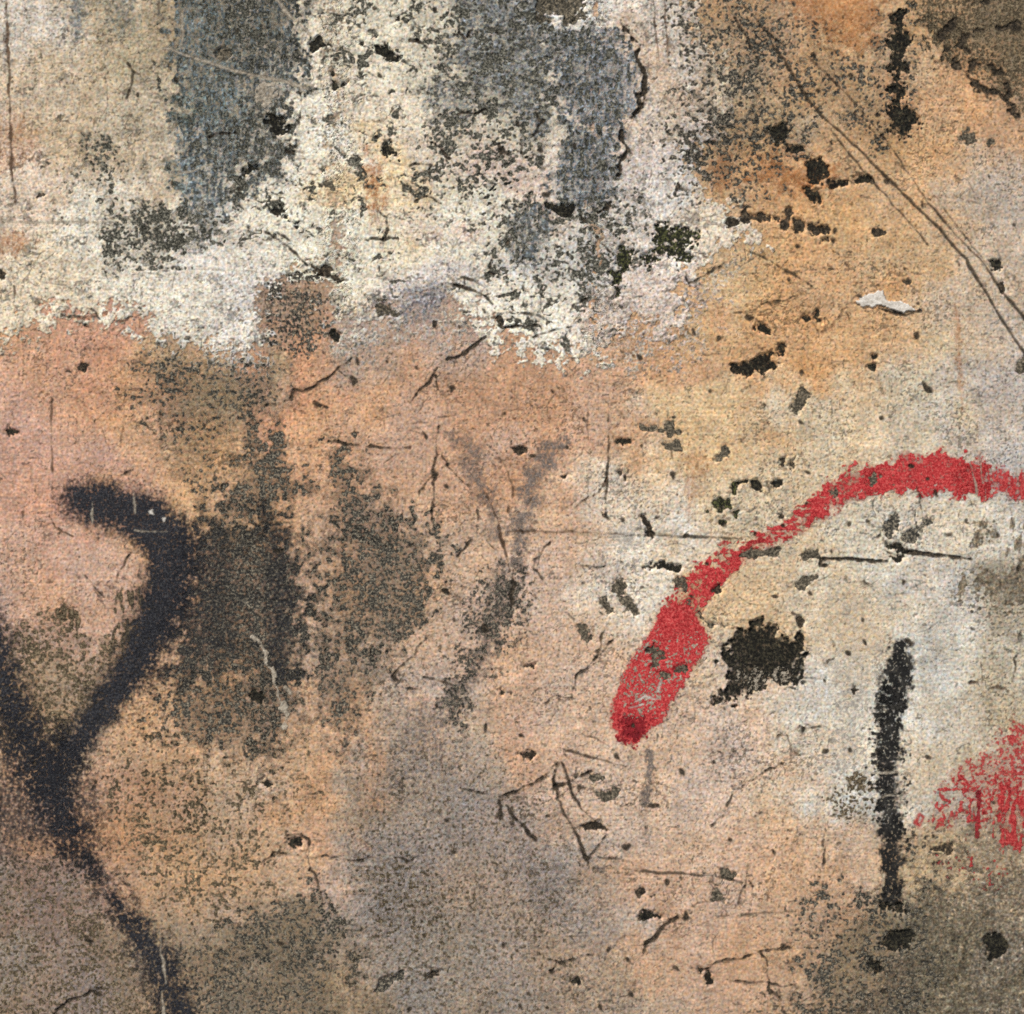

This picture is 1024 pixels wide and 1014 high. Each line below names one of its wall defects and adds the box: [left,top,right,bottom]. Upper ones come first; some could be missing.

crack [935,0,1022,118]
crack [738,252,812,313]
peeling [856,290,922,315]
crack [469,762,606,864]
crack [698,946,793,999]